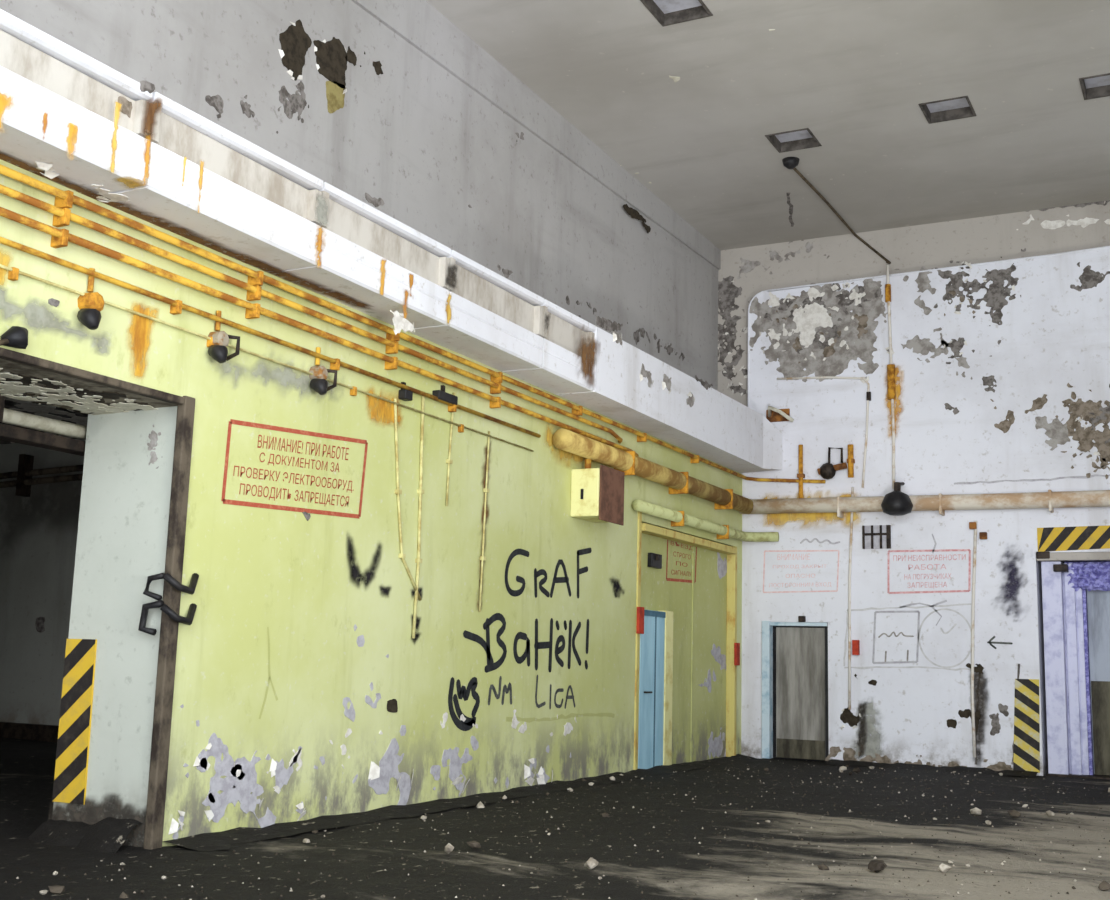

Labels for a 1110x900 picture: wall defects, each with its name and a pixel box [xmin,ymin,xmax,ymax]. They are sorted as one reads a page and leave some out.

peeling [278,19,383,123]
corrosion [0,93,12,127]
corrosion [67,123,78,154]
corrosion [110,99,162,188]
corrosion [129,305,157,377]
peeling [566,296,685,361]
peeling [718,240,1110,479]
peeling [0,367,158,426]
corrosion [886,367,902,436]
peeling [183,733,325,828]
peeling [329,682,414,805]
peeling [524,715,576,786]